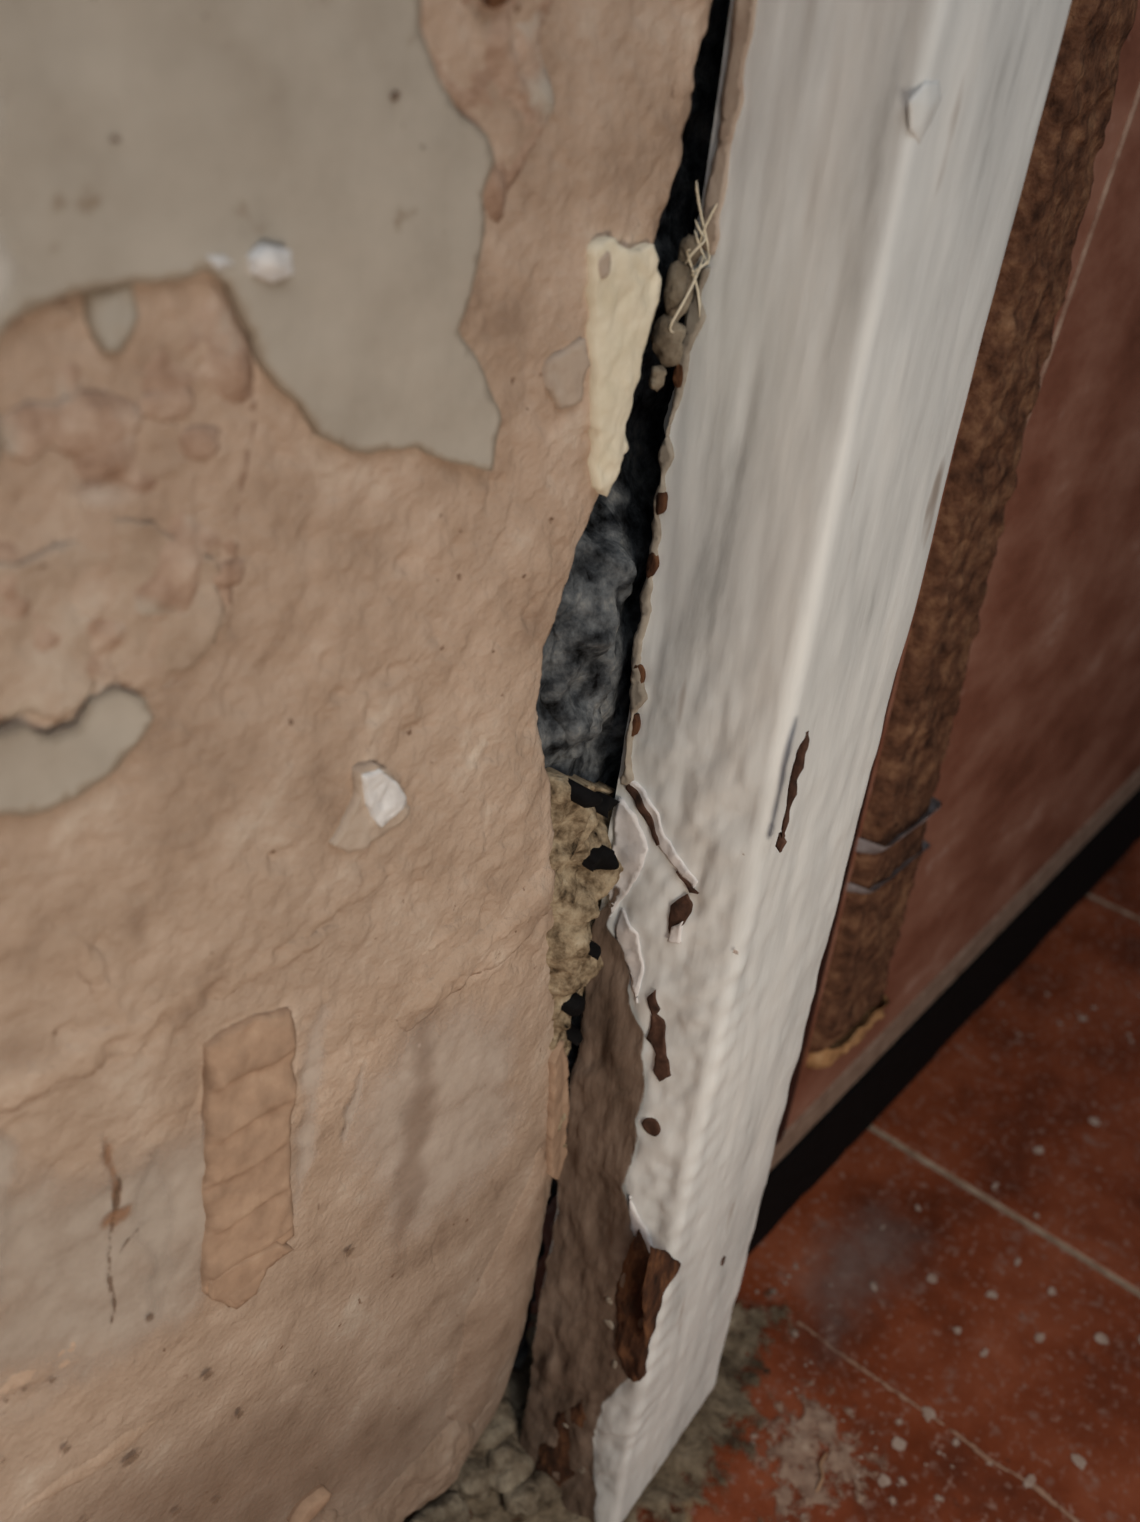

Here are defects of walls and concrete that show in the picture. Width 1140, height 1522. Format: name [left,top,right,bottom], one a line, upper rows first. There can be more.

peeling [0,0,555,816]
peeling [519,0,758,1522]